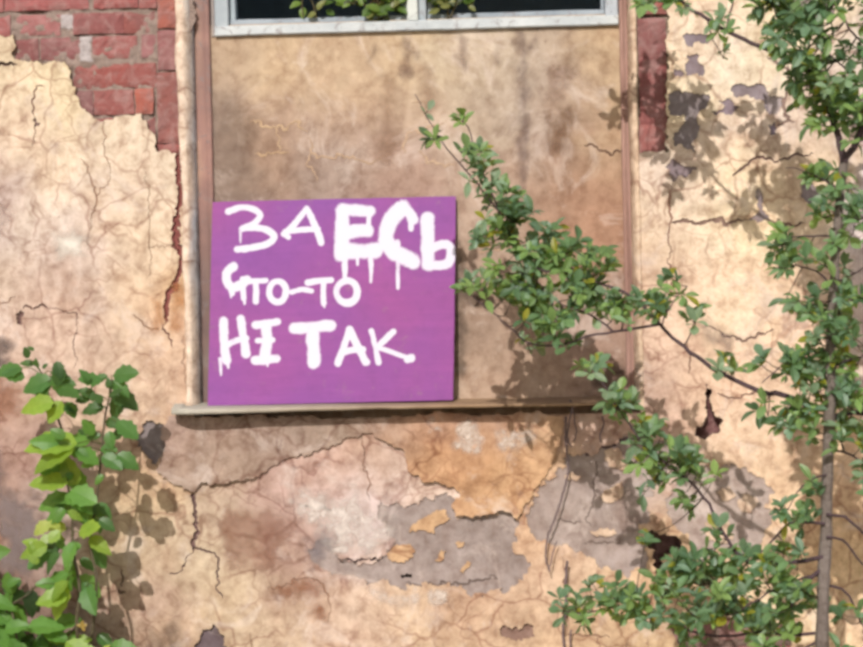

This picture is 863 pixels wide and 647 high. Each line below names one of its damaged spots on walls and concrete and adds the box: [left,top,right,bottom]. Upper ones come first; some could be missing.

crack [0,59,17,67]
flaking render [0,0,180,155]
flaking render [637,2,783,182]
crack [733,152,813,176]
crack [133,152,187,384]
leakage [0,339,10,366]
crack [0,297,78,366]
spalling [695,384,723,440]
peeling [136,410,775,599]
crack [170,494,224,598]
spalling [194,624,227,647]
flaking render [667,617,792,647]